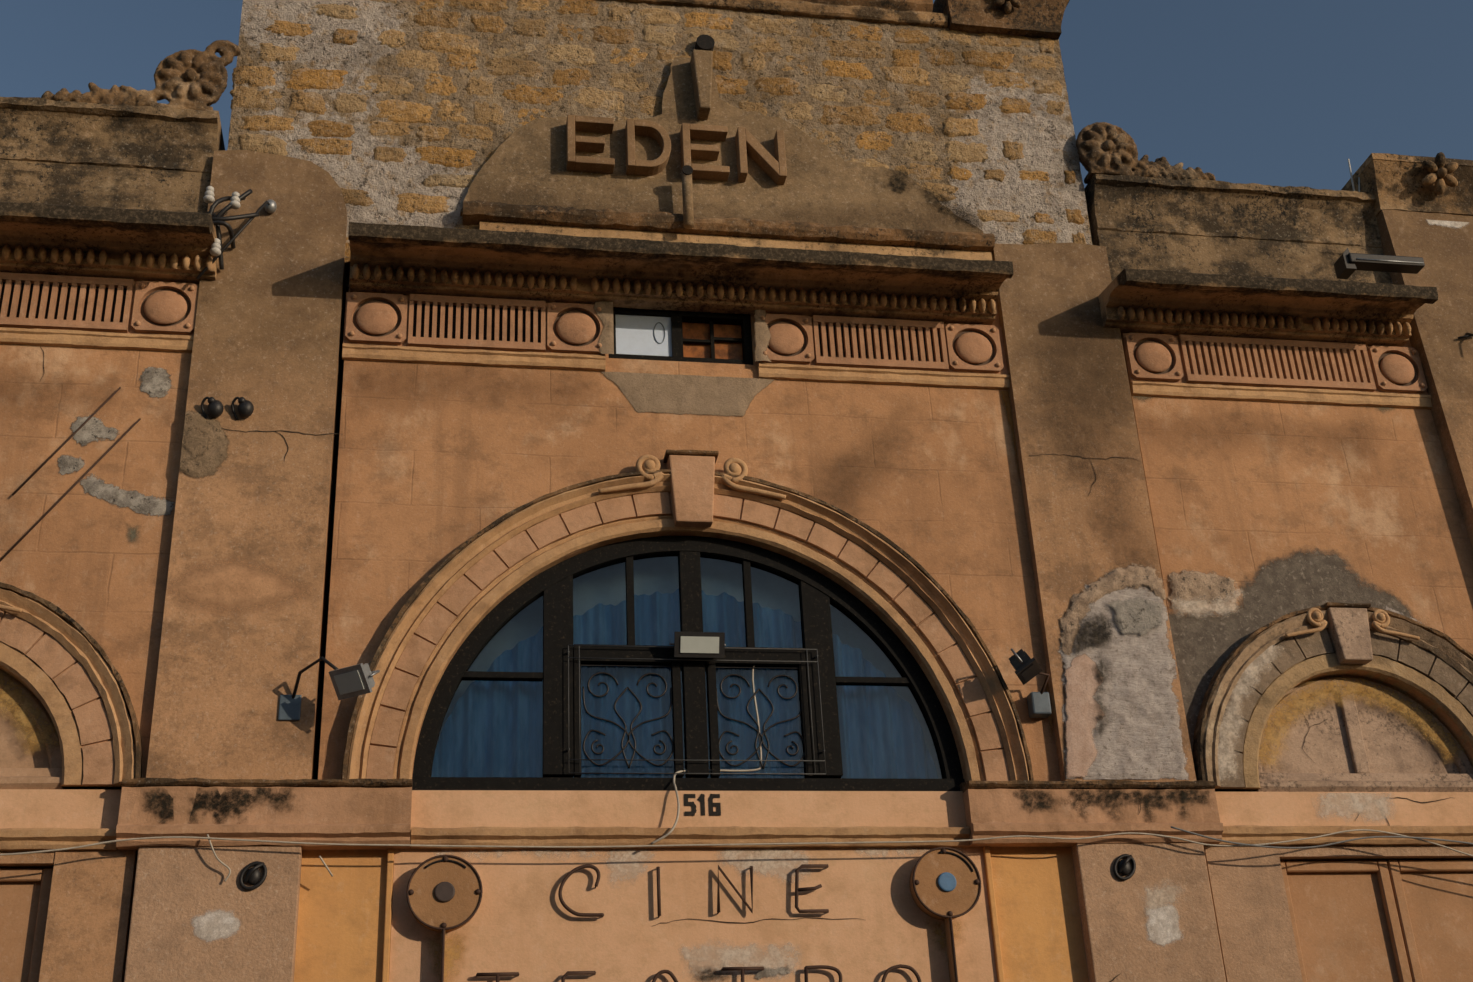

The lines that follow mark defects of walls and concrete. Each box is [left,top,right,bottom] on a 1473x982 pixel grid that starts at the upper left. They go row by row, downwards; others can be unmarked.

peeling [1058,548,1422,780]
water stain [146,787,289,824]
water stain [1016,789,1054,810]
water stain [1071,789,1207,822]